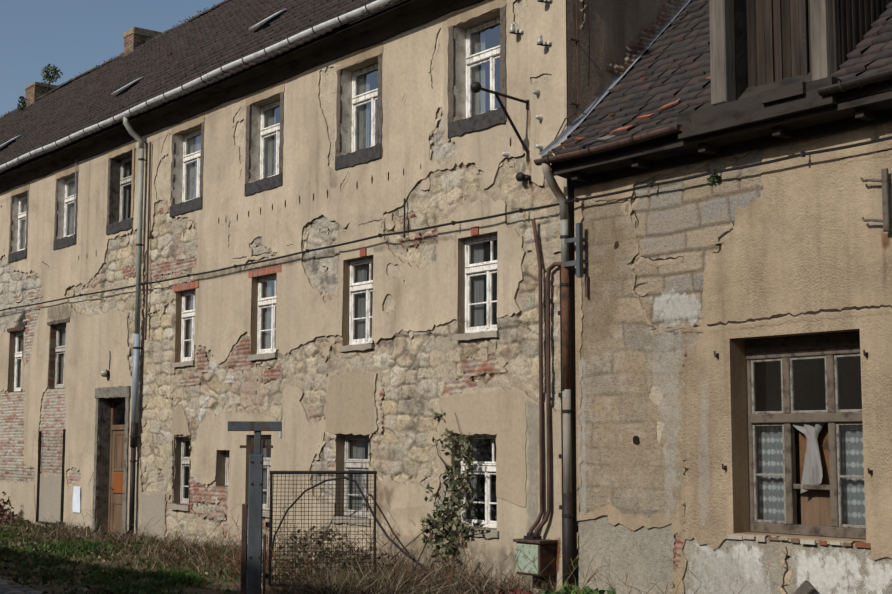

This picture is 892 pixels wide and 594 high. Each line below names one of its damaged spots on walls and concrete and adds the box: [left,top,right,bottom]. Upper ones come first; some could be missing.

crack [579,0,588,30]
flaking render [0,254,42,365]
flaking render [64,107,561,546]
flaking render [577,148,892,594]
crack [650,305,892,386]
flaking render [0,387,81,486]
crack [680,453,690,537]